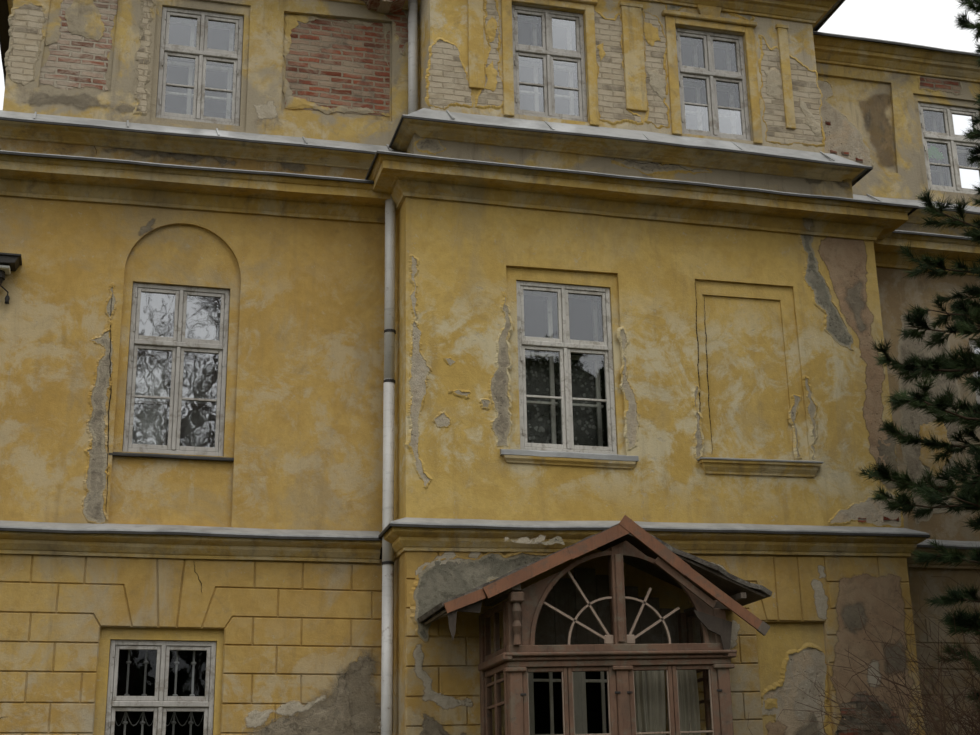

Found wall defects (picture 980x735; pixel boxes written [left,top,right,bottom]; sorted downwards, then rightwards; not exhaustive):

peeling [4,0,118,91]
peeling [254,79,390,119]
peeling [383,10,408,56]
peeling [425,0,504,110]
peeling [594,4,697,129]
peeling [758,34,874,167]
peeling [81,282,117,524]
peeling [405,254,433,489]
peeling [448,292,514,447]
peeling [818,237,961,528]
peeling [245,695,325,727]
spalling [420,714,449,735]